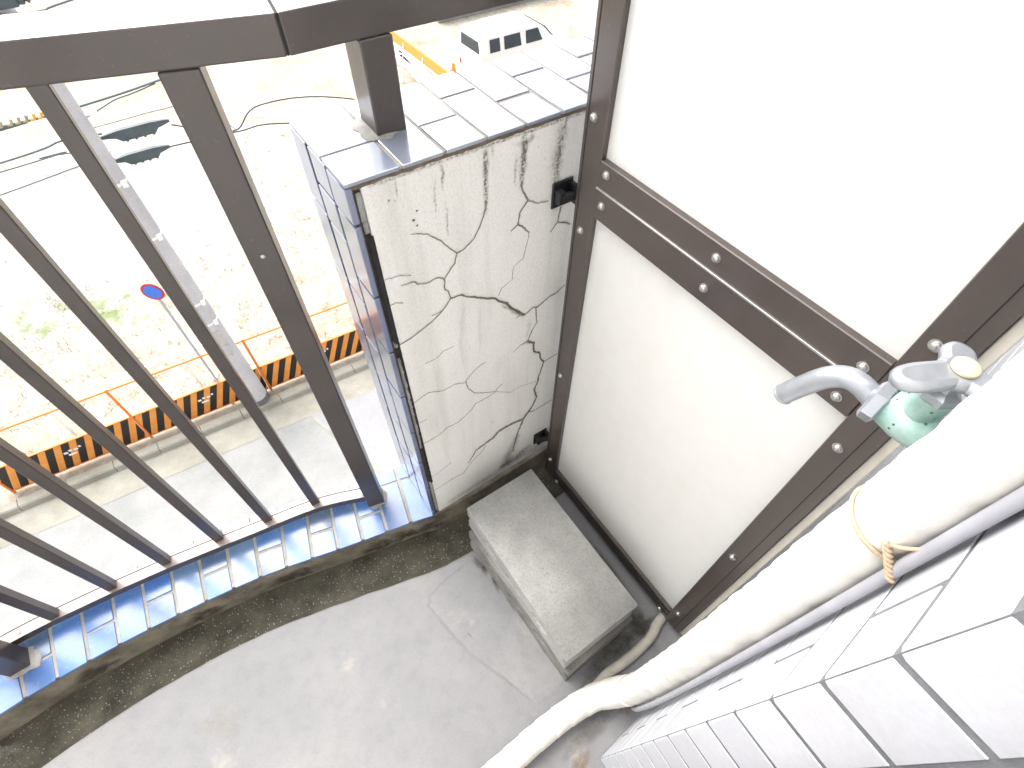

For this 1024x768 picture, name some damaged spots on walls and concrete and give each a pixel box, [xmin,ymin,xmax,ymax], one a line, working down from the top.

crack [386,183,570,489]